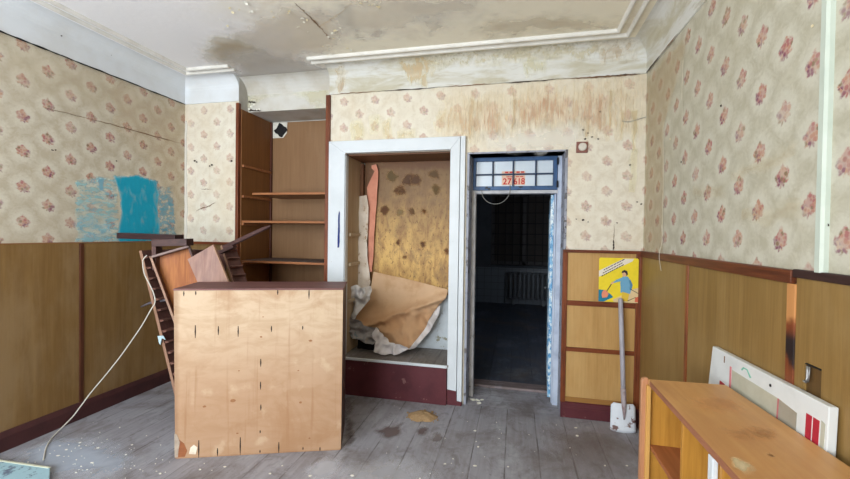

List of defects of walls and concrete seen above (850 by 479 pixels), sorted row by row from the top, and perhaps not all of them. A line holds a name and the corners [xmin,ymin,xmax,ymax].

crack [295,3,349,39]
leakage [210,41,258,59]